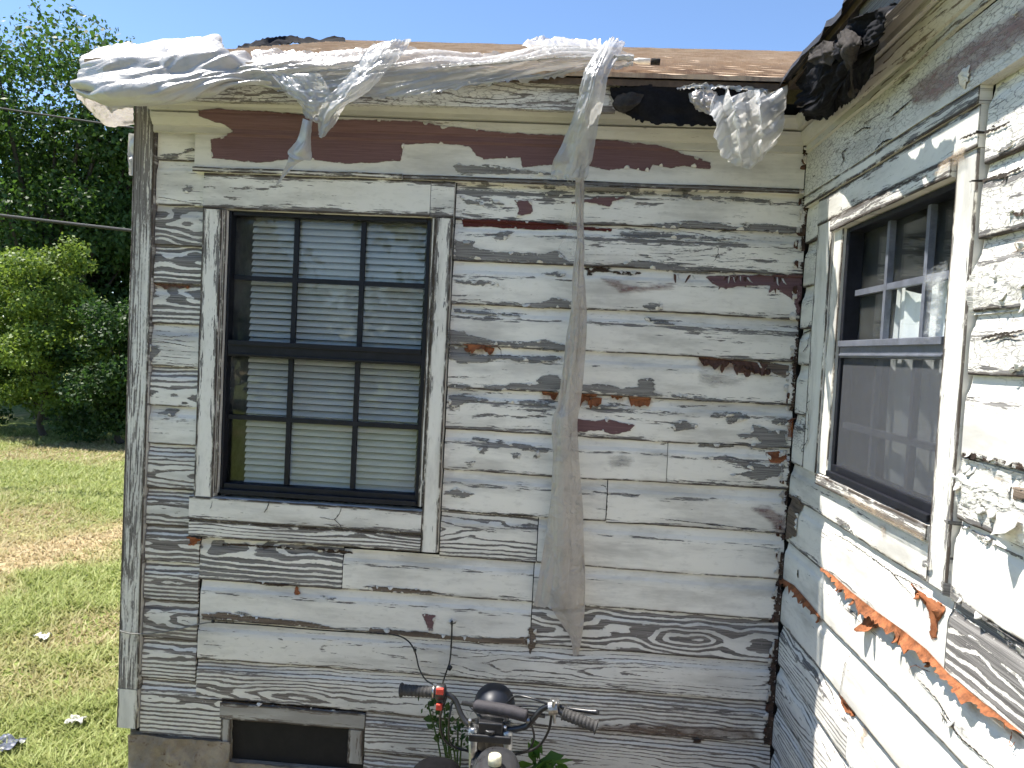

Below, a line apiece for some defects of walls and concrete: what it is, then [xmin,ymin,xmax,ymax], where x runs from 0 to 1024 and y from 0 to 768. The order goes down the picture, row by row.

crack [841,100,912,165]
crack [960,121,1010,140]
peeling [198,108,796,277]
crack [969,166,1023,183]
peeling [585,260,803,315]
peeling [447,330,565,408]
peeling [577,378,790,481]
crack [660,146,811,745]
peeling [201,611,330,629]
peeling [365,585,439,595]
peeling [369,614,537,654]
peeling [940,581,1024,656]